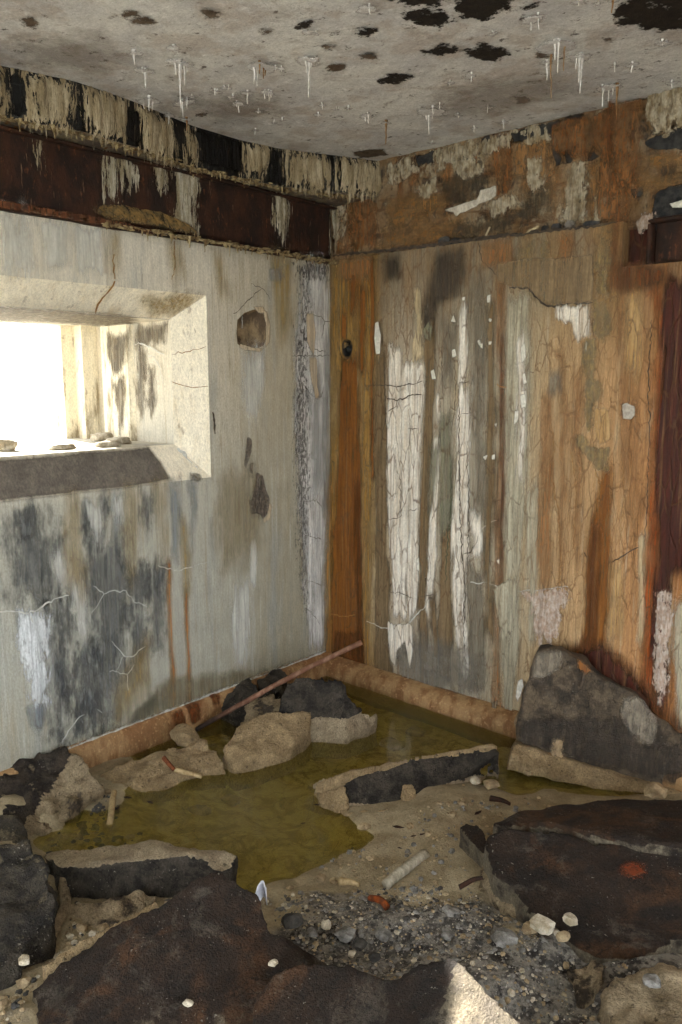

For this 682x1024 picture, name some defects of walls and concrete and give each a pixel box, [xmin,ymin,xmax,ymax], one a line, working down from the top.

damp [645,87,682,138]
rust [0,200,153,233]
peeling [446,186,496,216]
spalling [631,184,682,229]
crack [95,254,116,313]
crack [333,222,616,308]
spalling [237,307,270,352]
damp [0,114,572,750]
rust [330,259,375,664]
crack [305,320,652,665]
rust [538,223,682,733]
damp [520,535,682,784]